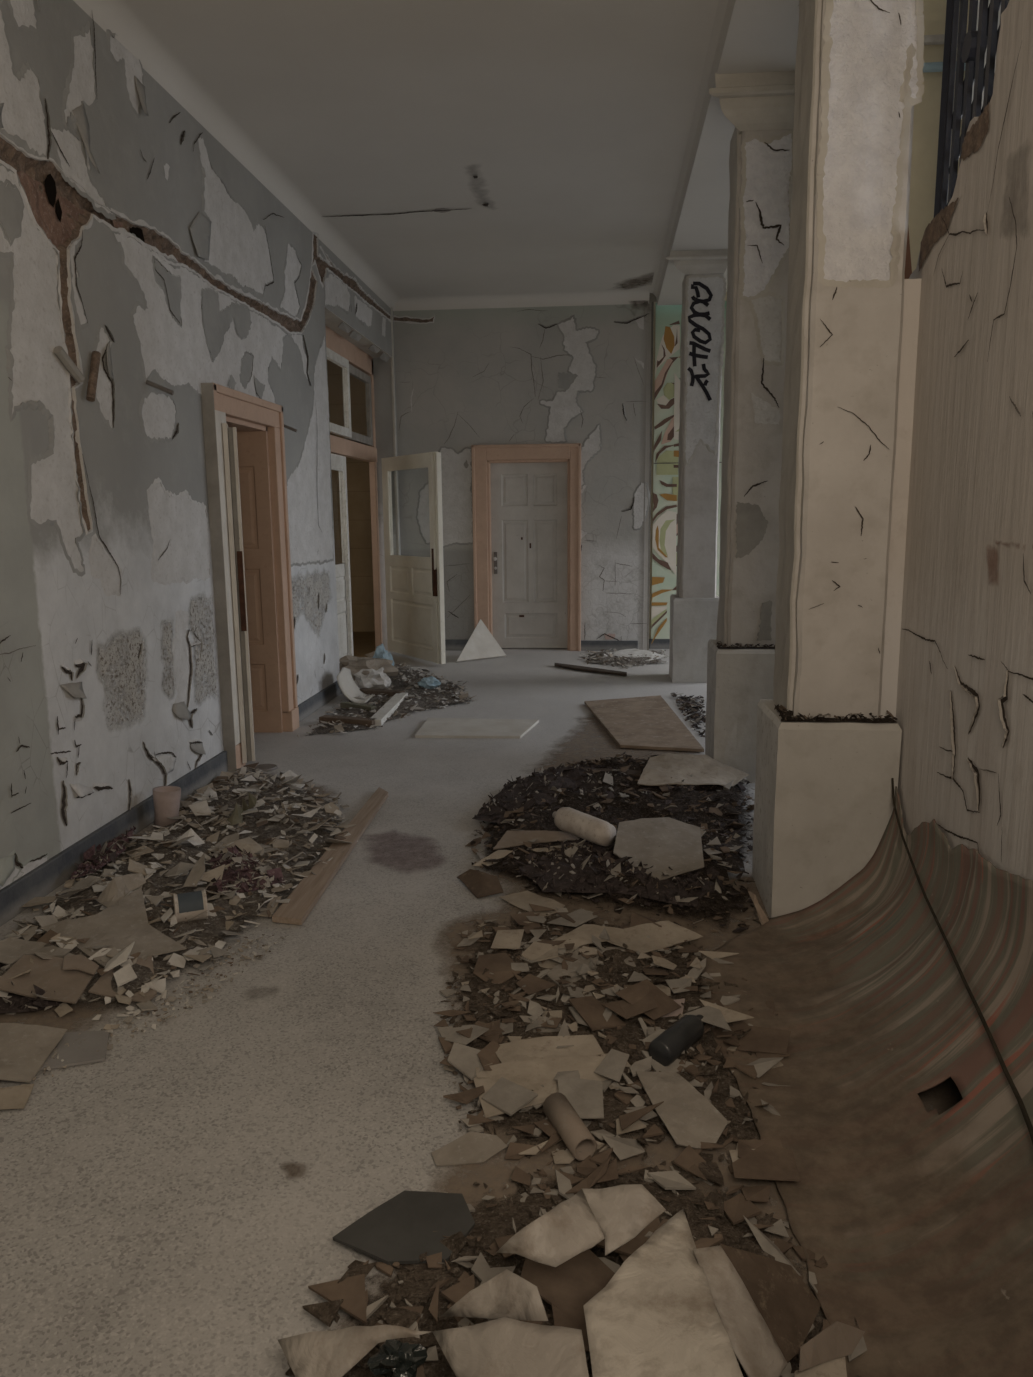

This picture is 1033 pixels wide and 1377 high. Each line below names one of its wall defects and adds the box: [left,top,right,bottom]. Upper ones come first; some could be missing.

crack [140,112,202,179]
peeling [0,0,435,632]
crack [330,208,466,217]
peeling [683,130,793,467]
peeling [816,0,925,289]
crack [933,42,1022,362]
peeling [51,477,217,826]
peeling [438,446,473,548]
crack [810,507,867,609]
crack [839,407,889,461]
crack [878,629,1033,855]
peeling [0,850,49,890]